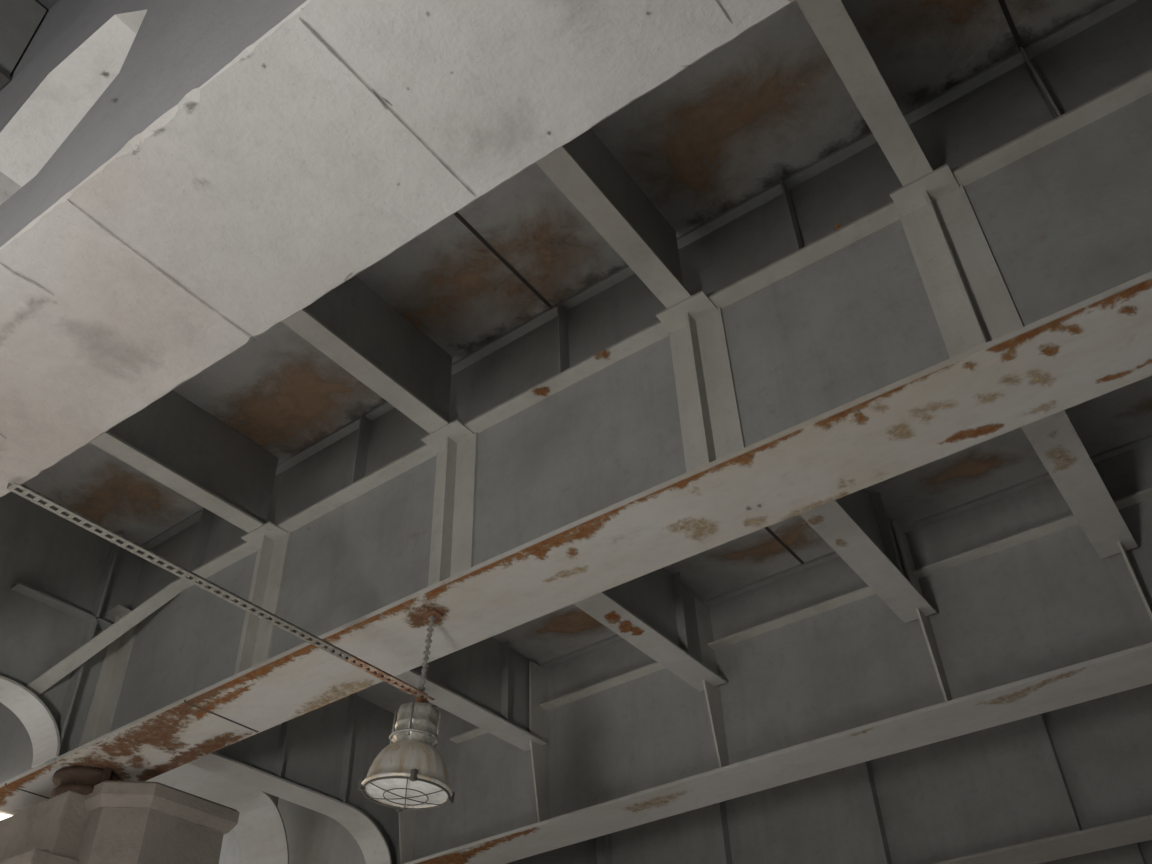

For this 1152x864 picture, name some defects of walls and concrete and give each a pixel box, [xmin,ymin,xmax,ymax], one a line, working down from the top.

corrosion [987,279,1152,361]
corrosion [1097,359,1152,383]
corrosion [533,387,550,396]
corrosion [815,363,976,429]
corrosion [942,424,1003,443]
corrosion [0,429,802,806]
corrosion [418,827,538,864]